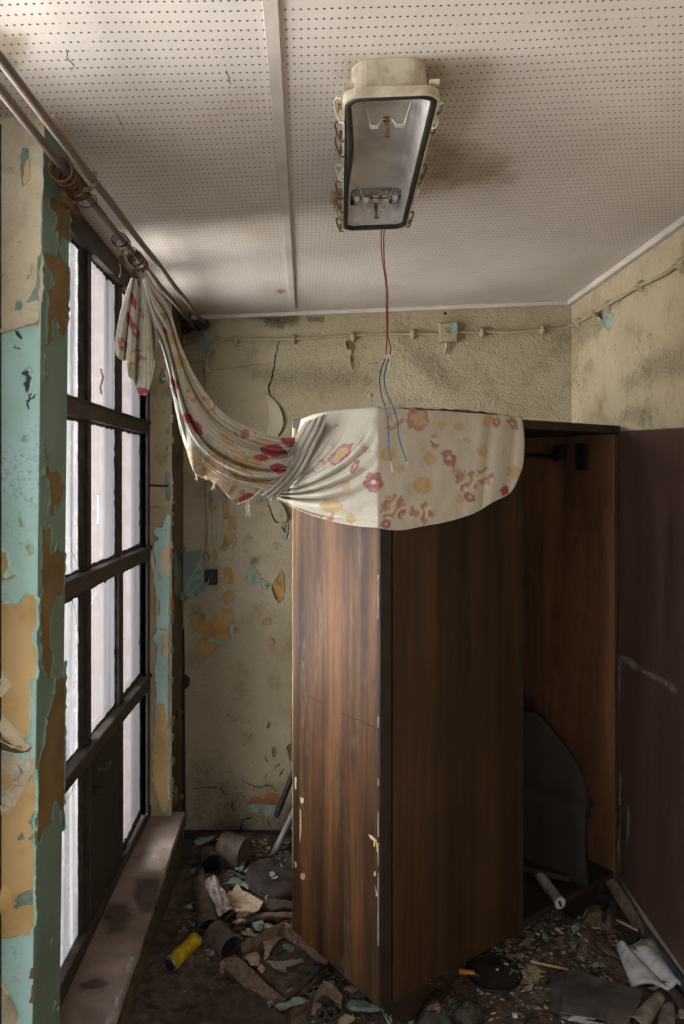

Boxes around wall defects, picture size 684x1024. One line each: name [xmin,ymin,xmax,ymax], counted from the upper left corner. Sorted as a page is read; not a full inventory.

peeling [0,116,72,394]
crack [215,341,284,437]
peeling [0,434,68,940]
peeling [149,471,286,812]
crack [195,764,284,830]
peeling [246,791,281,818]
peeling [1,980,20,1024]